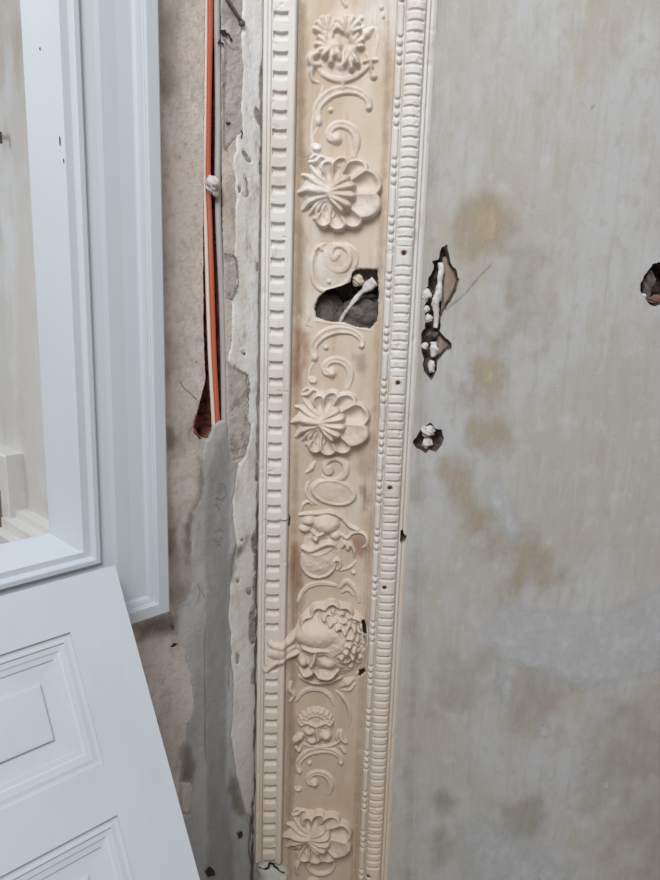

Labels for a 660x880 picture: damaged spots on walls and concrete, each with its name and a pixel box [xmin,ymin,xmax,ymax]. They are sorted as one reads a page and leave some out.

spalling [305,269,379,332]
flaking render [421,245,459,380]
flaking render [640,262,660,306]
peeling [193,0,263,879]
flaking render [413,422,445,453]
peeling [180,781,192,813]